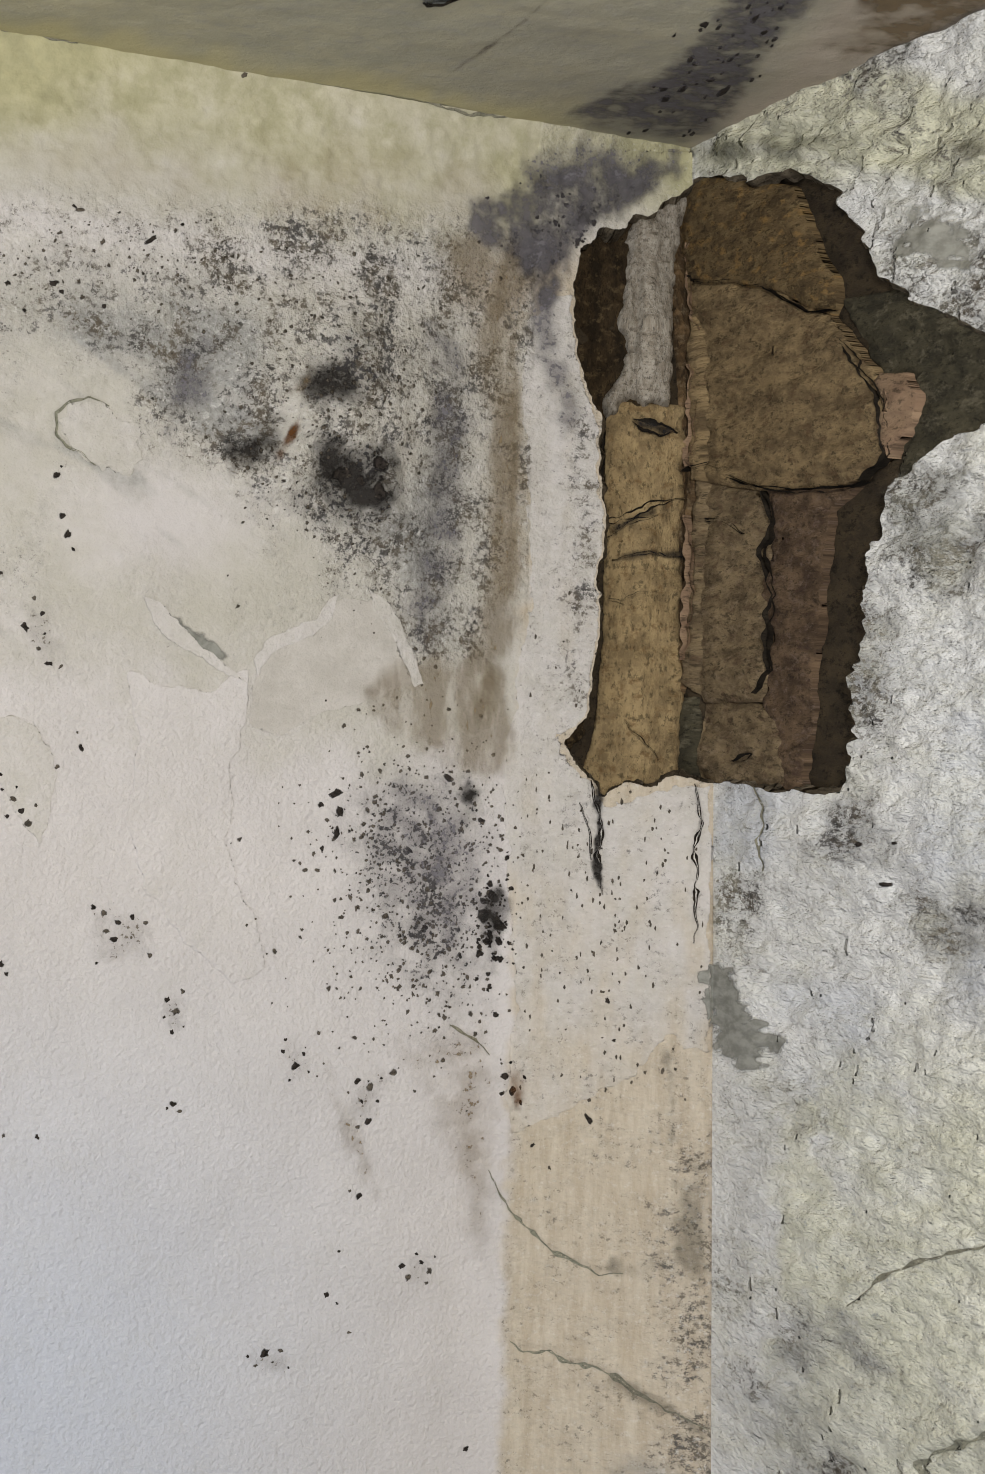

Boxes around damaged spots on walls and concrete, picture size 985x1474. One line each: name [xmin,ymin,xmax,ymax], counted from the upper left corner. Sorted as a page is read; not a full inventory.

damp [0,0,806,631]
damp [20,596,63,669]
spalling [503,168,985,1133]
damp [278,647,526,1174]
crack [488,1170,623,1276]
crack [847,1245,985,1306]
crack [510,1341,709,1431]
crack [913,1431,985,1474]